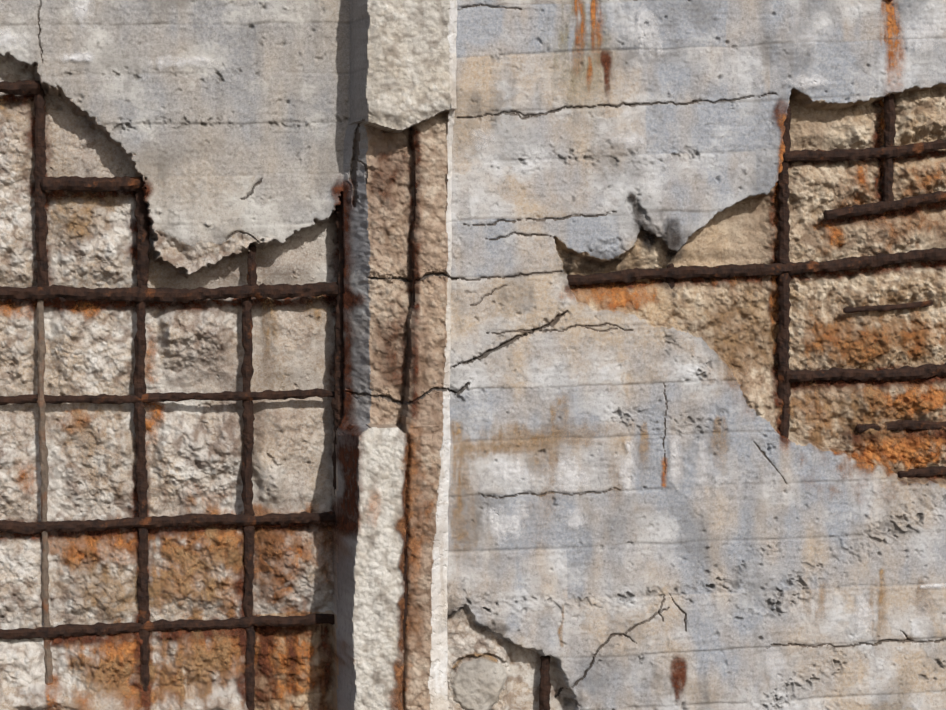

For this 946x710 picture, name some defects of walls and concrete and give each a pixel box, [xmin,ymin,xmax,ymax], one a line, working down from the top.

rust [574,0,611,90]
rust [881,0,902,68]
crack [457,92,778,120]
rust [566,100,946,482]
spalling [0,53,349,710]
rust [0,180,364,710]
crack [352,311,633,406]
spalling [447,83,946,710]
rust [398,435,434,580]
crack [555,594,687,698]
rust [671,658,687,699]
crack [766,630,946,649]